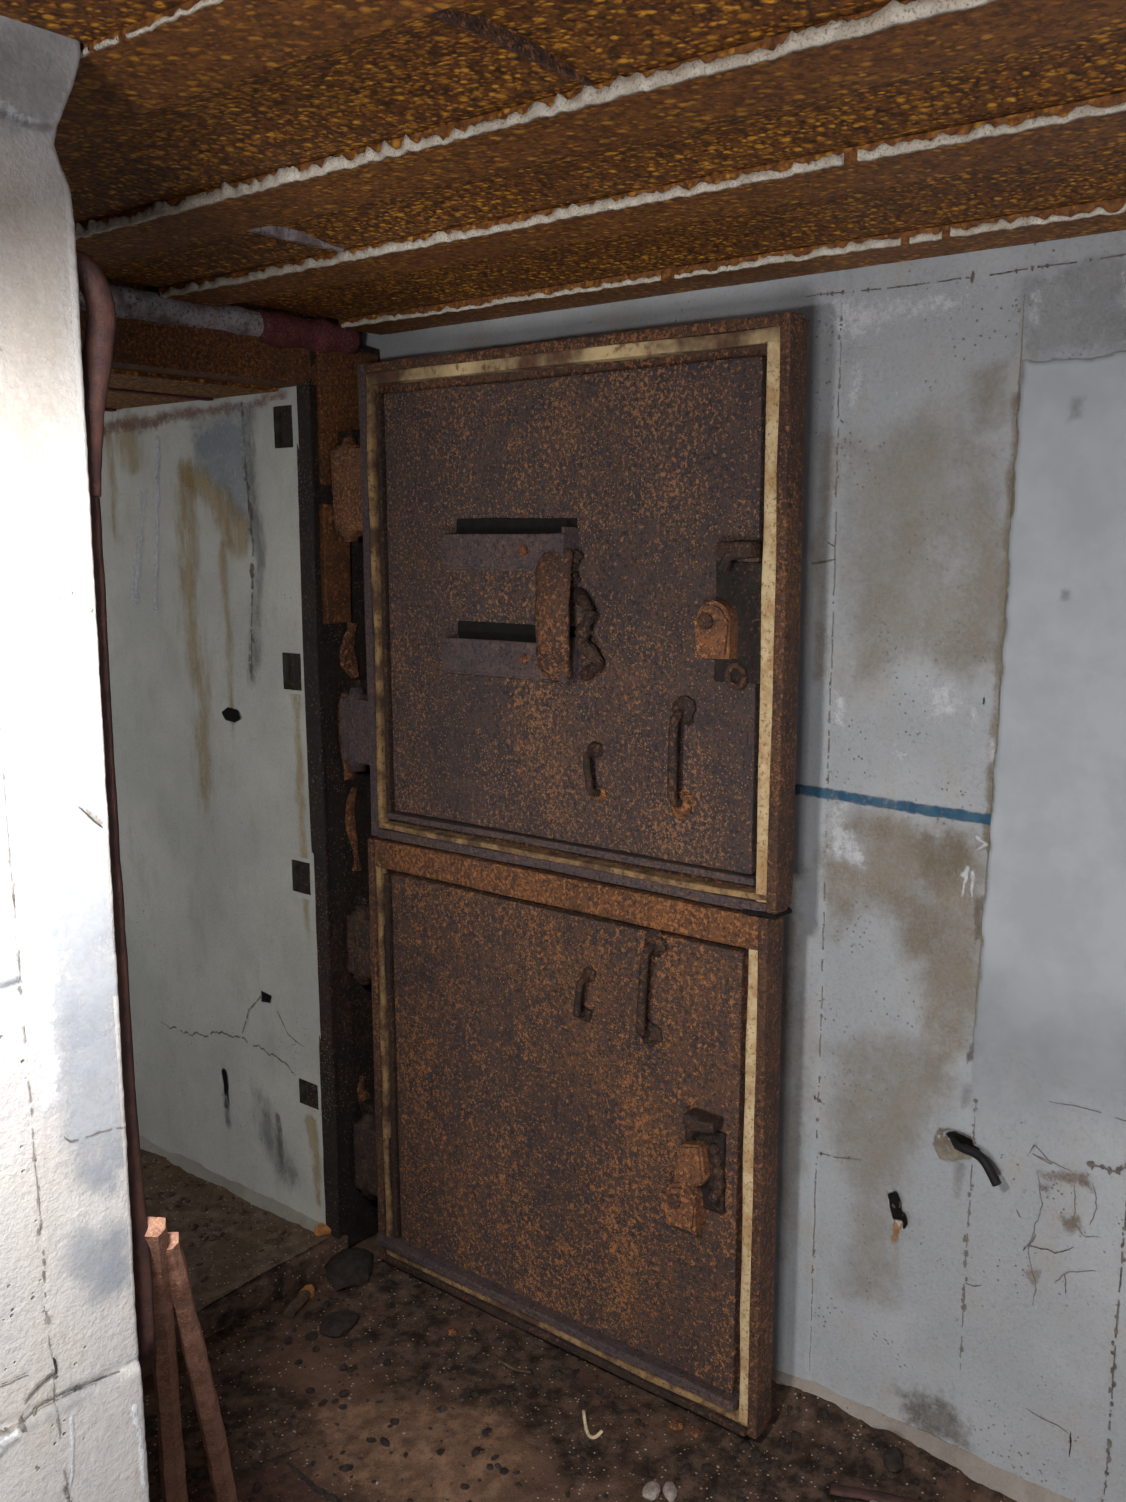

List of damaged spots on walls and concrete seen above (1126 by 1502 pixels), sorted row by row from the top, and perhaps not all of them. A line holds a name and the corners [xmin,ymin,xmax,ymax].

damp [826,801,988,1048]
crack [161,996,302,1076]
crack [1052,1102,1126,1122]
crack [1016,1144,1126,1300]
damp [0,1429,21,1454]